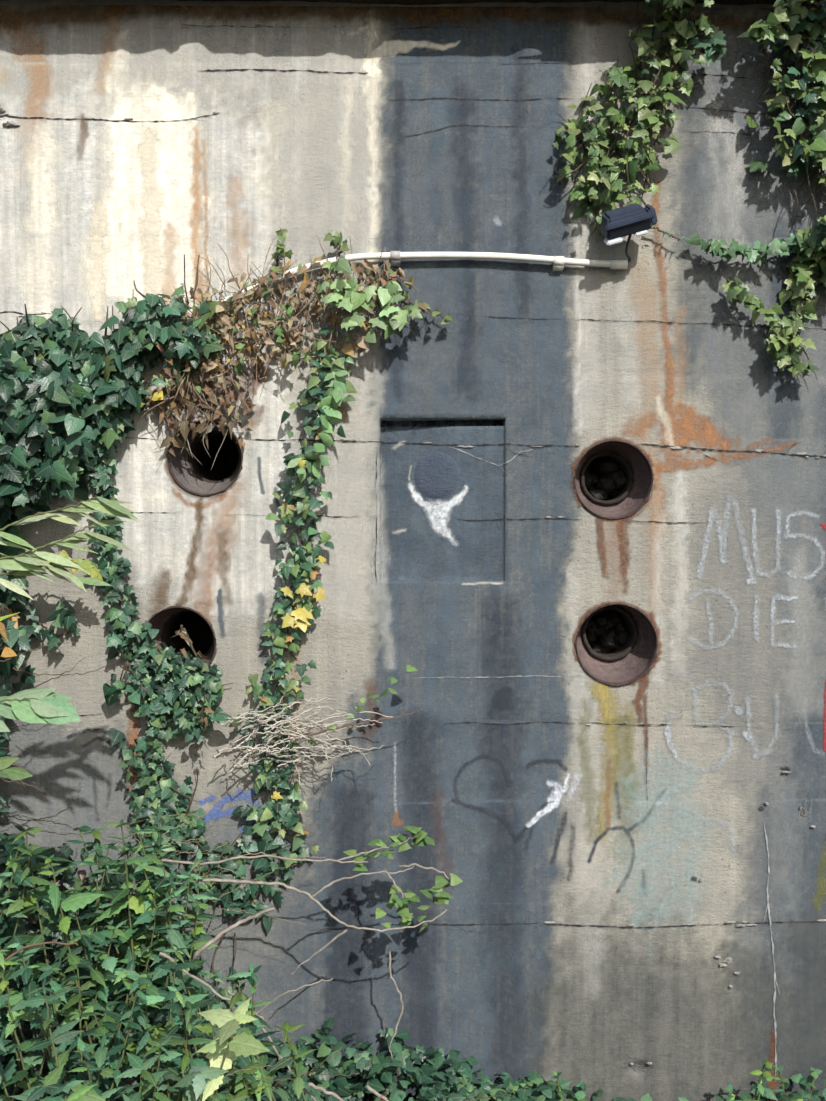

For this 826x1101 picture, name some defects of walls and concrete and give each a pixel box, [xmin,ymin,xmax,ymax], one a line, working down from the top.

crack [0,112,220,122]
crack [205,67,368,75]
rust [0,5,807,33]
rust [192,141,208,302]
water stain [0,15,296,637]
rust [572,308,787,506]
crack [643,442,826,460]
rust [165,461,227,606]
water stain [182,7,826,1101]
water stain [0,717,147,934]
water stain [37,940,59,992]
crack [310,823,826,1081]